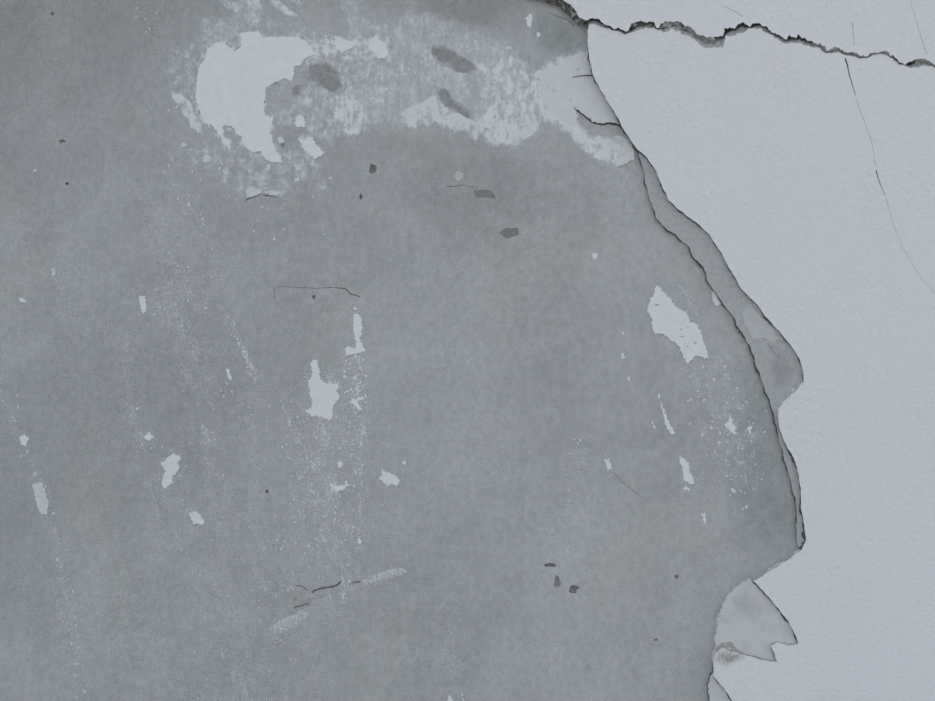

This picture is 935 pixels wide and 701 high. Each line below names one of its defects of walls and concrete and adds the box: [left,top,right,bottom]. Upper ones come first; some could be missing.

spalling [258,0,354,56]
spalling [354,0,606,120]
spalling [575,107,656,171]
peeling [345,314,366,356]
peeling [647,285,709,364]
spalling [713,242,802,367]
peeling [306,359,340,421]
peeling [161,453,181,489]
peeling [379,470,400,486]
spalling [798,496,806,550]
spalling [712,578,777,662]
spalling [753,561,789,623]